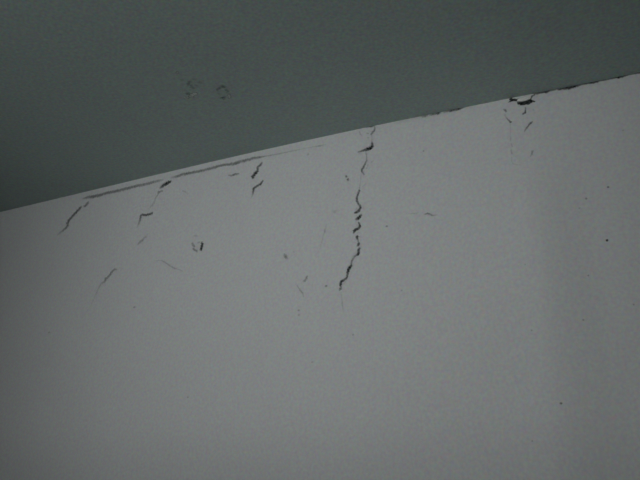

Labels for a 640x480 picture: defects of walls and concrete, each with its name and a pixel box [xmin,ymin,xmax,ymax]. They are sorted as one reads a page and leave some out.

flaking render [509,96,535,105]
crack [337,126,377,289]